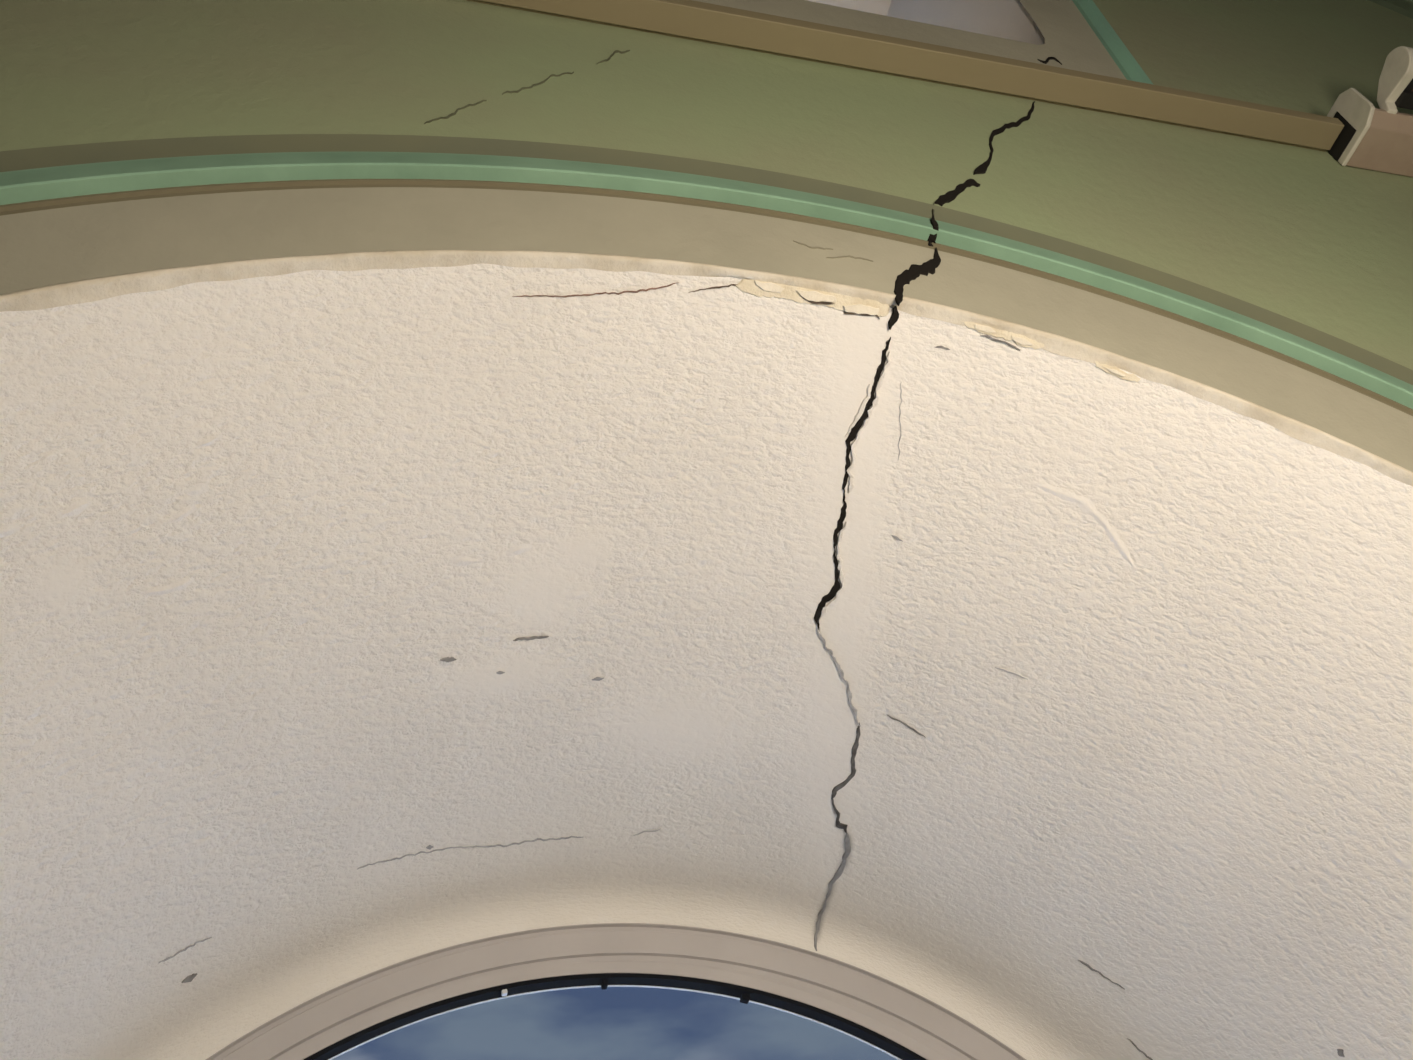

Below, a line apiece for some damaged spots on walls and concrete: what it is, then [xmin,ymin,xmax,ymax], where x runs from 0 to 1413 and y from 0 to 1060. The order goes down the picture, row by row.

crack [424,50,630,124]
crack [512,283,738,297]
crack [793,101,1035,951]